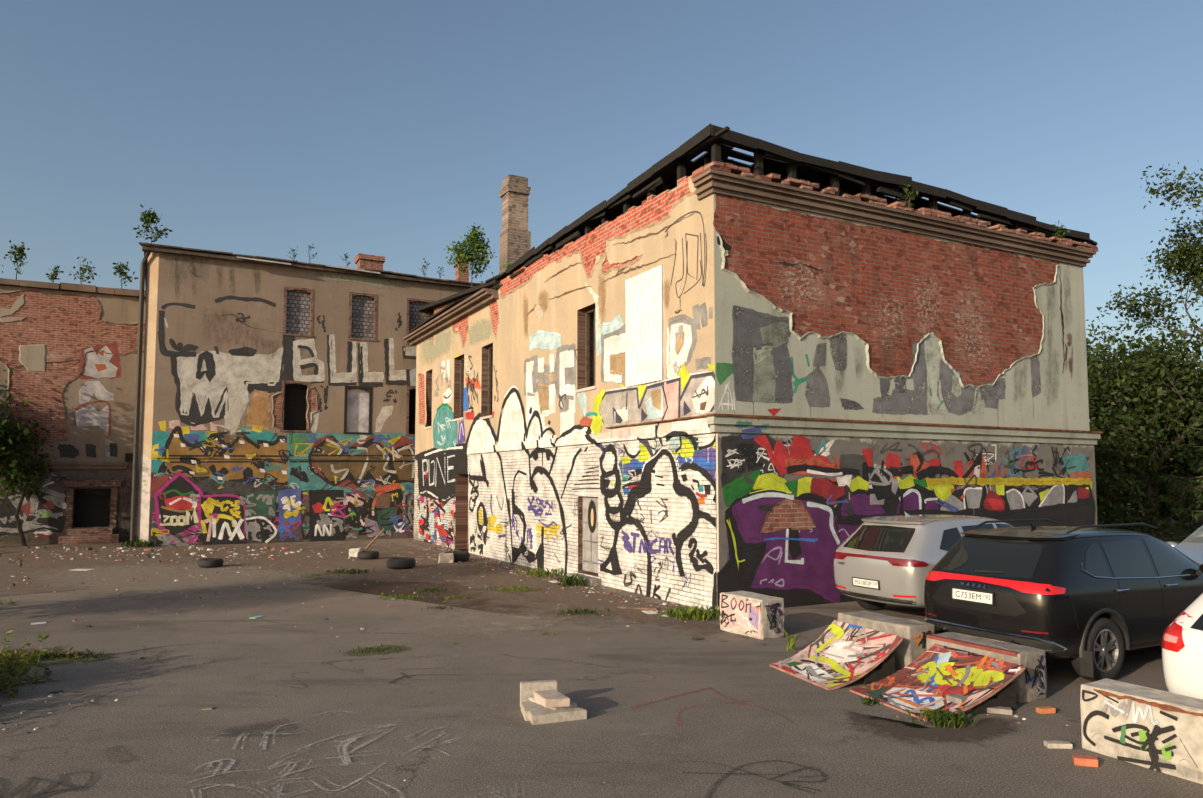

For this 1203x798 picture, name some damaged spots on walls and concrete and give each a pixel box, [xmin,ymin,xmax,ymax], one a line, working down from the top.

peeling [0,289,145,447]
peeling [488,176,696,339]
peeling [713,194,1060,389]